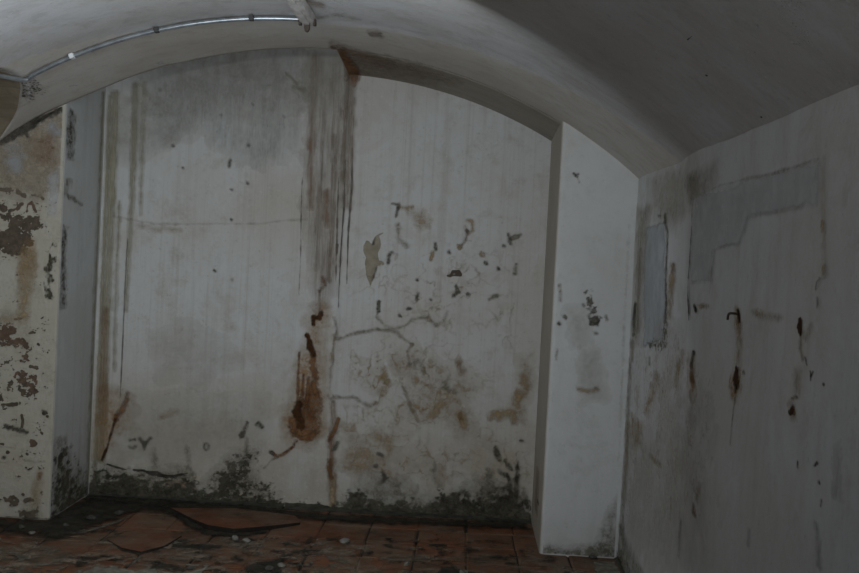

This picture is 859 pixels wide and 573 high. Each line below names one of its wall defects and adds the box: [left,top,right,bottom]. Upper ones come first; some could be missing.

peeling [0,187,57,260]
peeling [35,243,57,299]
leakage [51,83,286,516]
flaking render [363,233,392,285]
peeling [447,270,469,297]
peeling [0,317,49,477]
rust [98,392,129,461]
crack [269,441,297,460]
rust [284,277,326,443]
leakage [299,410,531,519]
rust [729,351,745,419]
peeling [0,491,44,519]